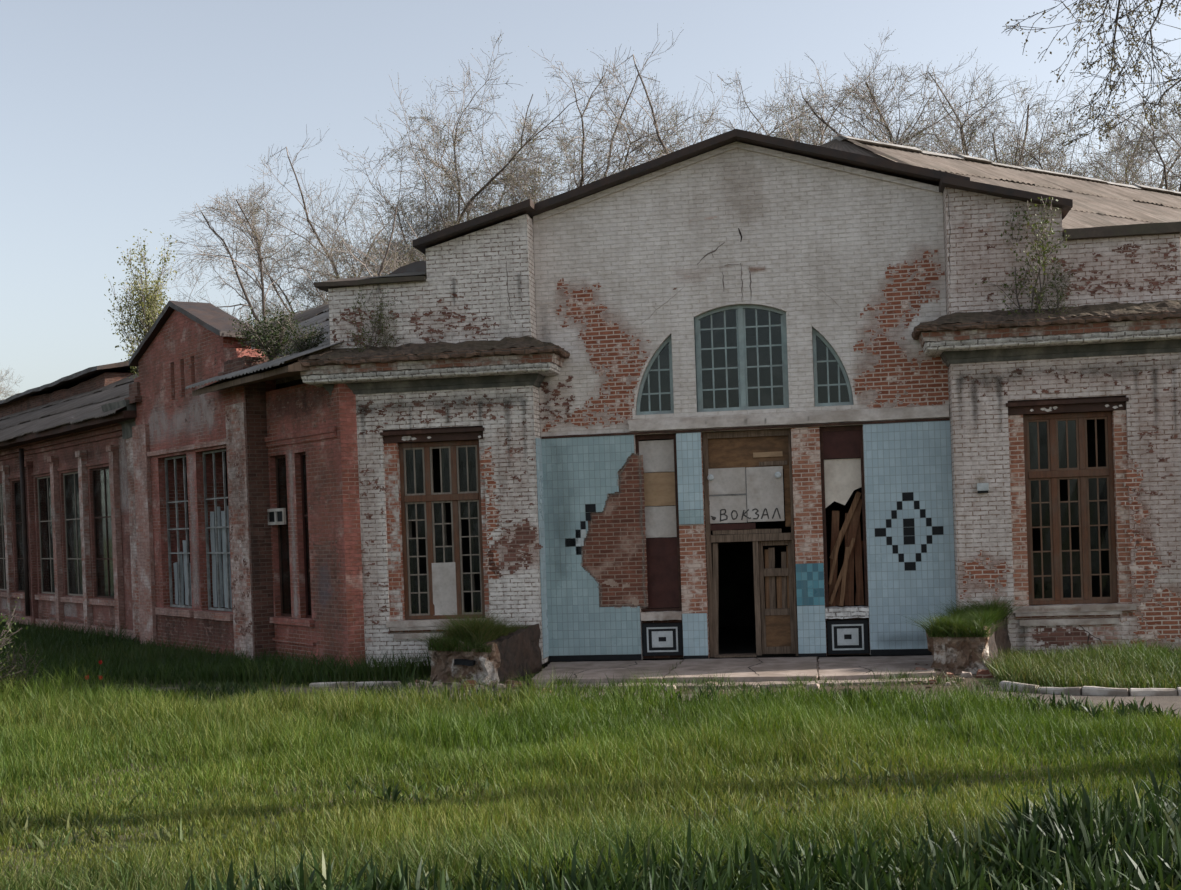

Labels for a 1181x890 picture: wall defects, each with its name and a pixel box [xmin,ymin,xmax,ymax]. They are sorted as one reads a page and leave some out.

spalling [1005,242,1181,300]
spalling [332,294,499,347]
peeling [539,278,652,432]
peeling [853,249,949,409]
spalling [356,393,514,441]
spalling [963,368,1087,412]
peeling [478,421,543,579]
peeling [1105,369,1181,644]
peeling [960,550,1014,599]
peeling [1032,625,1095,648]